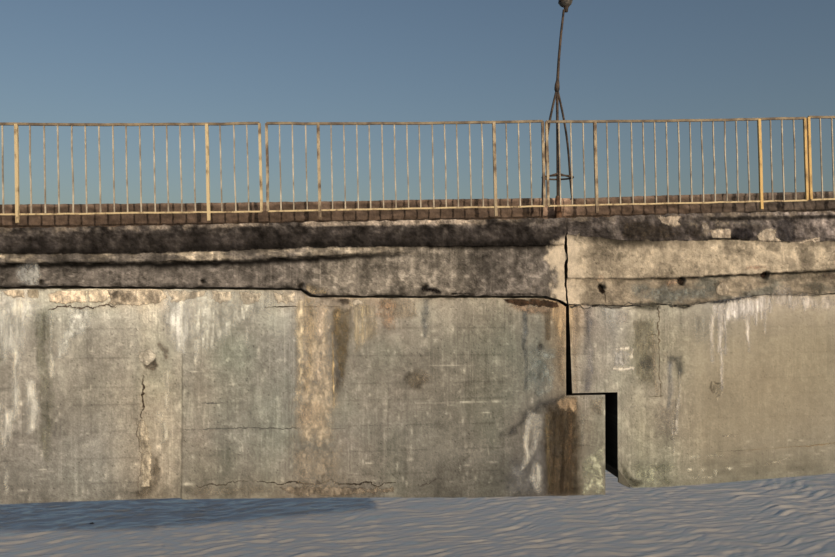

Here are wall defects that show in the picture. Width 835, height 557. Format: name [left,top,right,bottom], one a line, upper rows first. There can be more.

leakage [624,222,700,240]
leakage [733,228,755,238]
leakage [778,220,796,242]
spalling [4,290,39,298]
spalling [49,290,261,310]
peeling [274,293,295,303]
leakage [711,274,835,359]
leakage [0,294,32,377]
corrosion [332,299,350,393]
leakage [28,381,38,429]
corrosion [546,399,578,495]